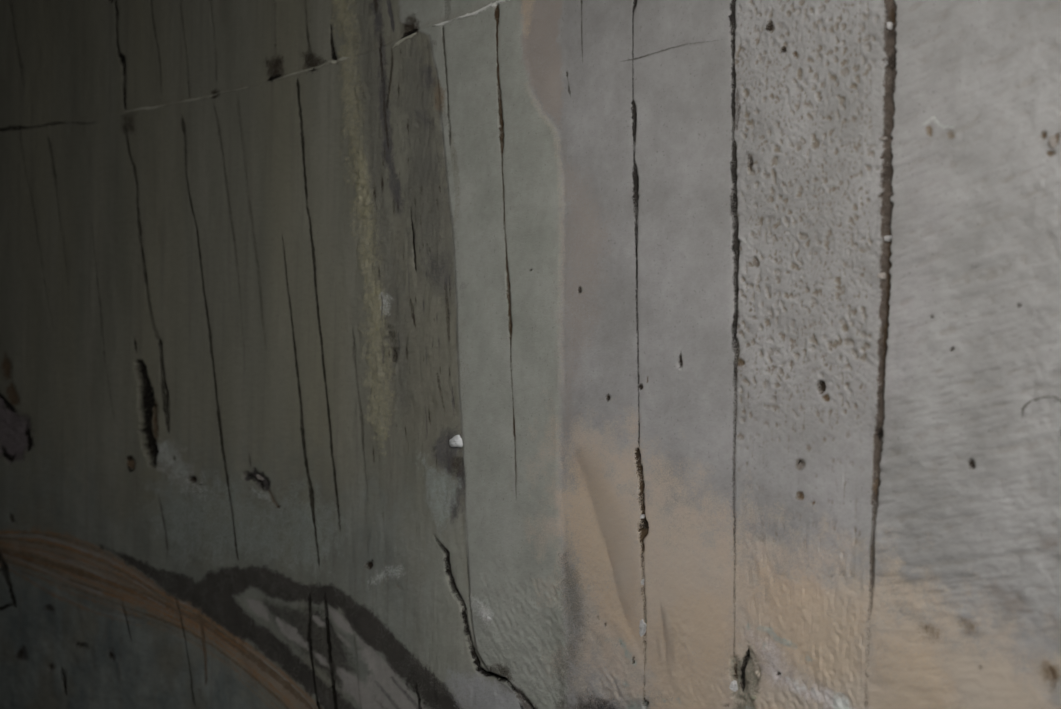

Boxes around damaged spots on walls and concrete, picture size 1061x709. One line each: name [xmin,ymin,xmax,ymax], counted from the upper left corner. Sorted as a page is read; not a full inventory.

crack [110,0,170,432]
crack [494,5,517,500]
crack [434,535,518,693]
spalling [724,648,761,709]